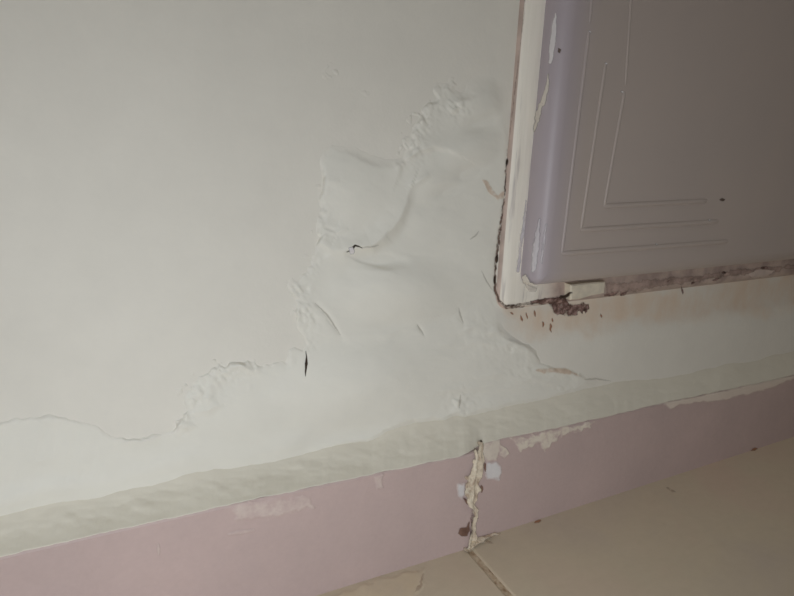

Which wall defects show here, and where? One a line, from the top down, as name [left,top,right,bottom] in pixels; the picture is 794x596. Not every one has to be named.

peeling [0,58,598,516]
crack [464,440,486,552]